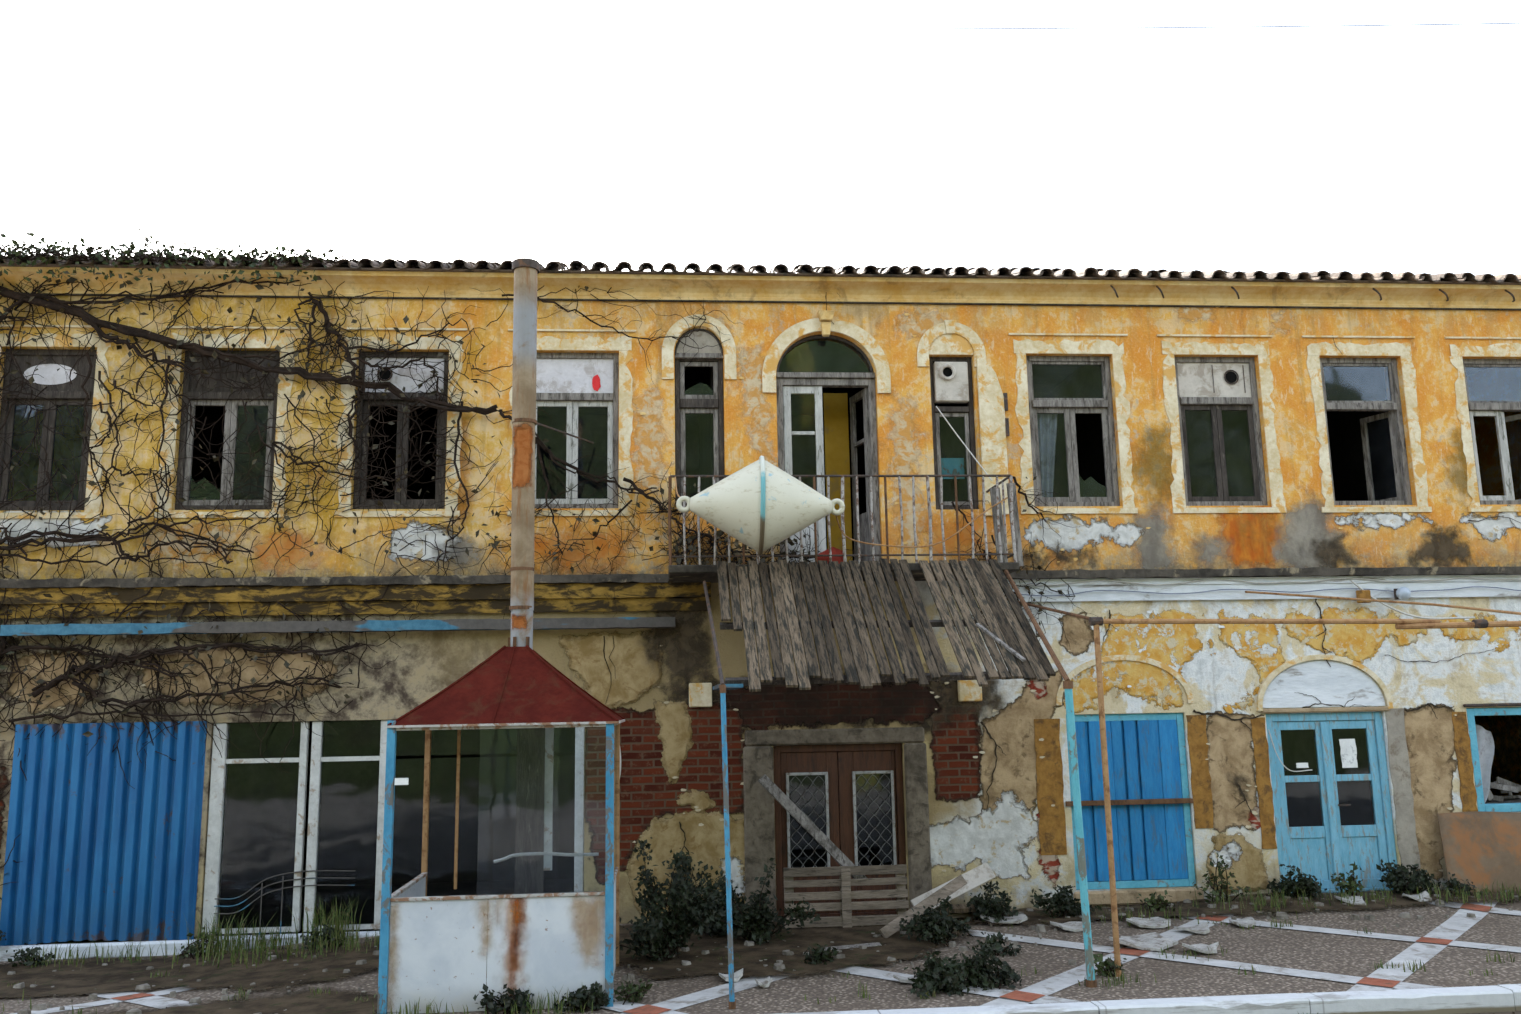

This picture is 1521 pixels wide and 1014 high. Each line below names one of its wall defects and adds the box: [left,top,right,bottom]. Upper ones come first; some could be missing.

peeling [379,520,463,569]
peeling [1009,514,1151,569]
leakage [1274,501,1357,568]
peeling [1334,506,1433,531]
leakage [1409,525,1470,566]
peeling [1459,505,1521,542]
crack [603,636,615,704]
peeling [1026,605,1521,714]
flaking render [559,630,1064,887]
crack [980,721,1006,812]
peeling [1206,777,1269,896]
rust [507,898,524,971]